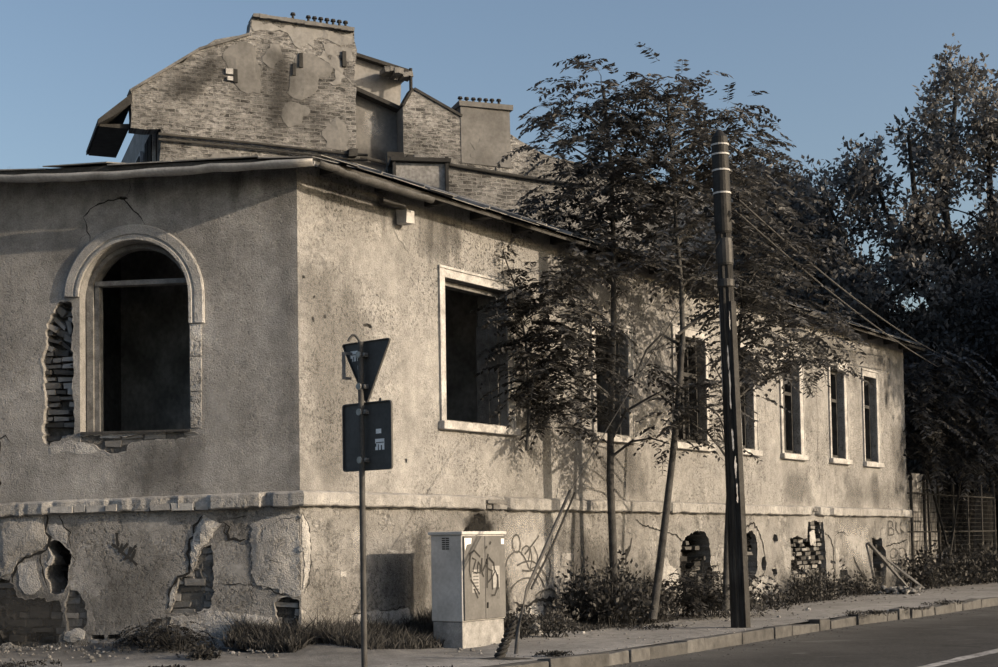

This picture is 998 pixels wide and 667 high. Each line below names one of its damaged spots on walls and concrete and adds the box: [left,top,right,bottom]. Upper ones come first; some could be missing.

flaking render [223,20,353,128]
flaking render [322,116,350,150]
crack [79,180,145,244]
spalling [40,303,200,455]
crack [12,515,76,587]
spalling [0,515,89,648]
spalling [169,515,221,614]
flaking render [301,514,311,590]
spalling [662,529,713,605]
flaking render [747,529,779,605]
spalling [790,520,827,594]